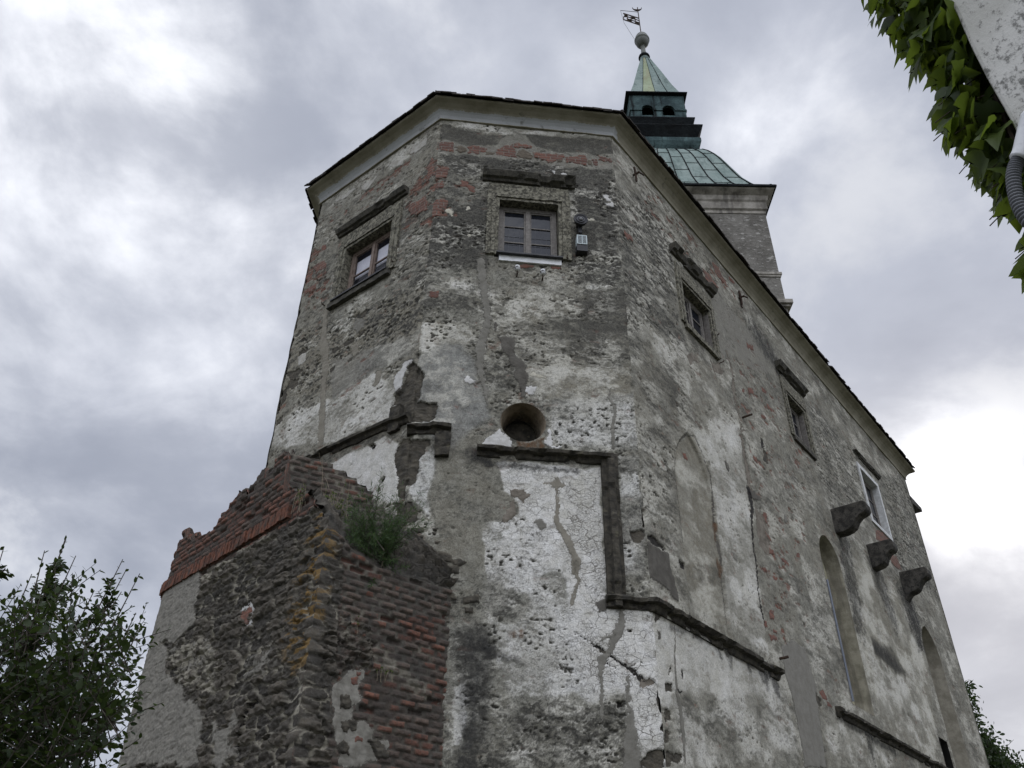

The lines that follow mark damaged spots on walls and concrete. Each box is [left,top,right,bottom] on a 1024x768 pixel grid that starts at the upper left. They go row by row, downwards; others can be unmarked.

spalling [392,360,438,423]
spalling [394,439,431,523]
crack [543,477,581,607]
flaking render [240,602,255,626]
flaking render [331,669,390,767]
leakage [456,636,504,768]
crack [575,609,686,768]